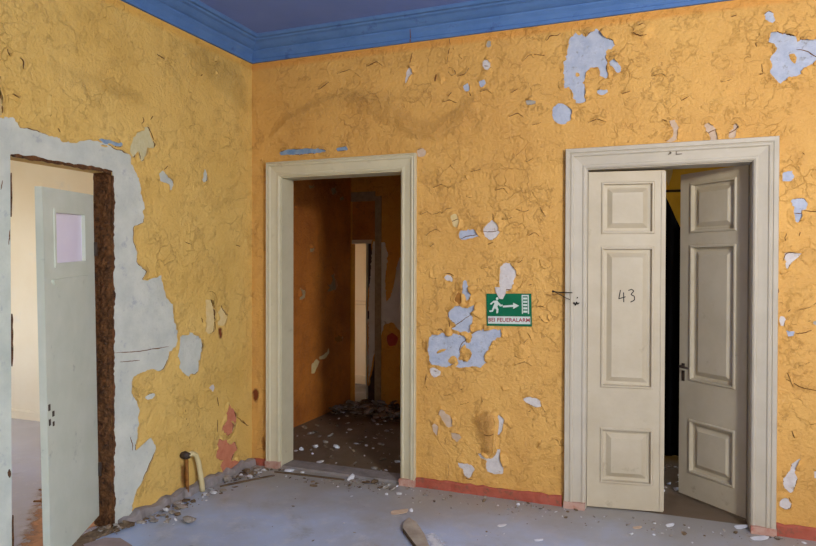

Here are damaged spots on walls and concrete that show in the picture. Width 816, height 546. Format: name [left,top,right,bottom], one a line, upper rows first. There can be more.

peeling [552,26,622,127]
peeling [759,7,816,85]
flaking render [0,76,228,546]
peeling [423,273,507,381]
spalling [209,381,248,472]
peeling [456,406,510,480]
peeling [776,457,816,513]